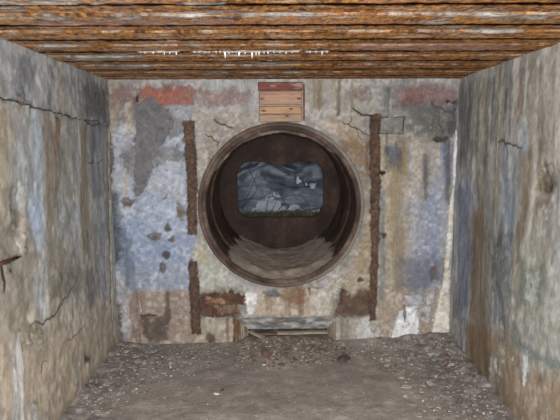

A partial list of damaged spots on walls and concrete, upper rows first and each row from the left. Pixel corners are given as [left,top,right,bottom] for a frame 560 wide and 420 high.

crack [0,87,106,133]
crack [342,108,405,140]
peeling [110,84,249,221]
corrosion [199,290,246,342]
corrosion [336,290,370,317]